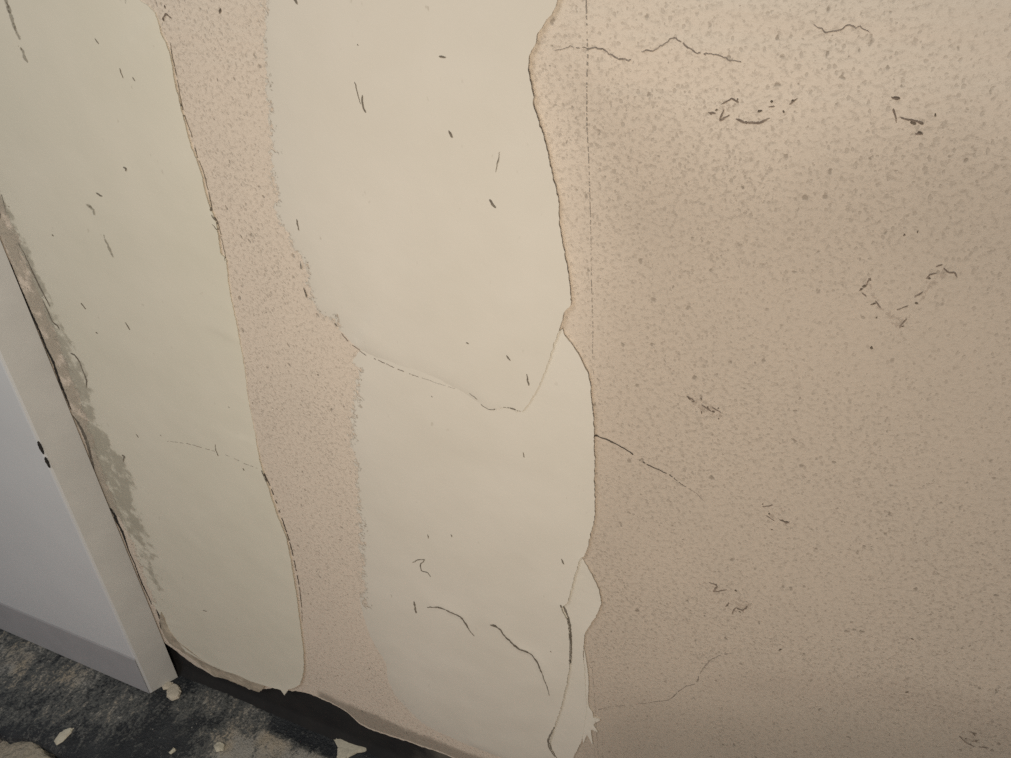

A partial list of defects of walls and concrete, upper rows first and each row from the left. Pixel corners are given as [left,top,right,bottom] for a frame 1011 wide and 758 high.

peeling [0,0,304,695]
peeling [260,0,601,758]